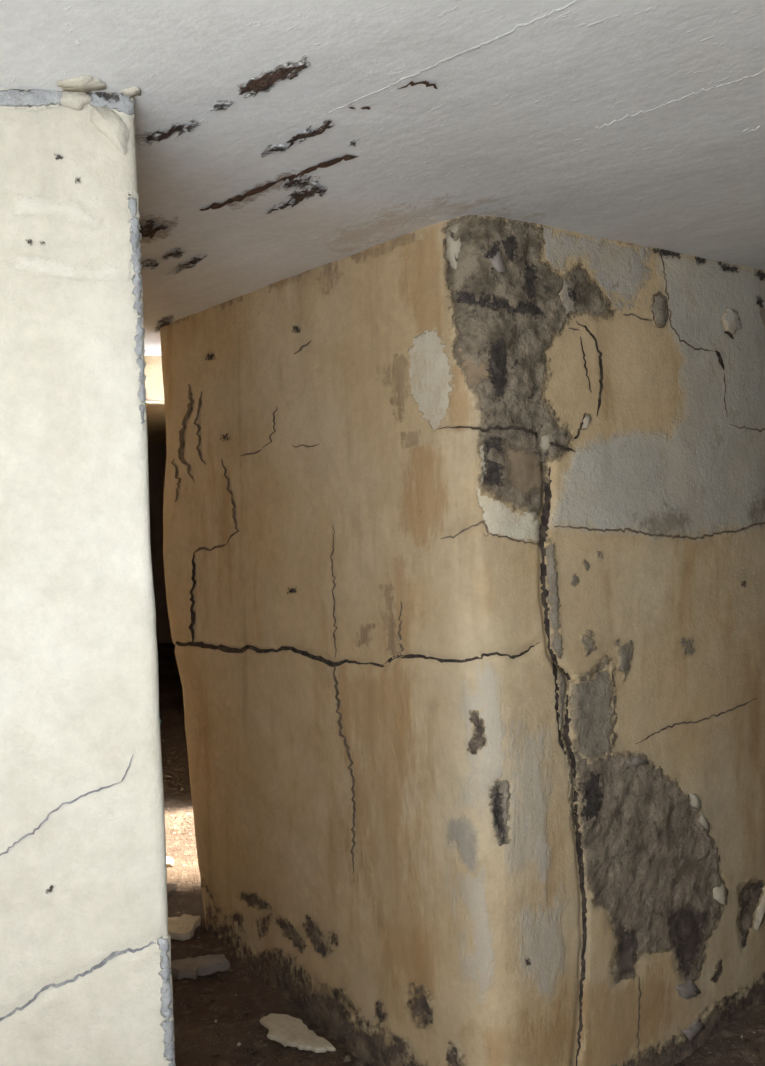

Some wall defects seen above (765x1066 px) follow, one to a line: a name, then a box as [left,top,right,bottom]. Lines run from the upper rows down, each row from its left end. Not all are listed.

crack [623,252,765,432]
flaking render [569,550,603,588]
crack [171,321,603,1066]
crack [636,698,757,744]
crack [0,754,134,856]
flaking render [565,629,765,999]
crack [0,941,156,1021]
leakage [201,876,468,1066]
leakage [611,972,765,1066]